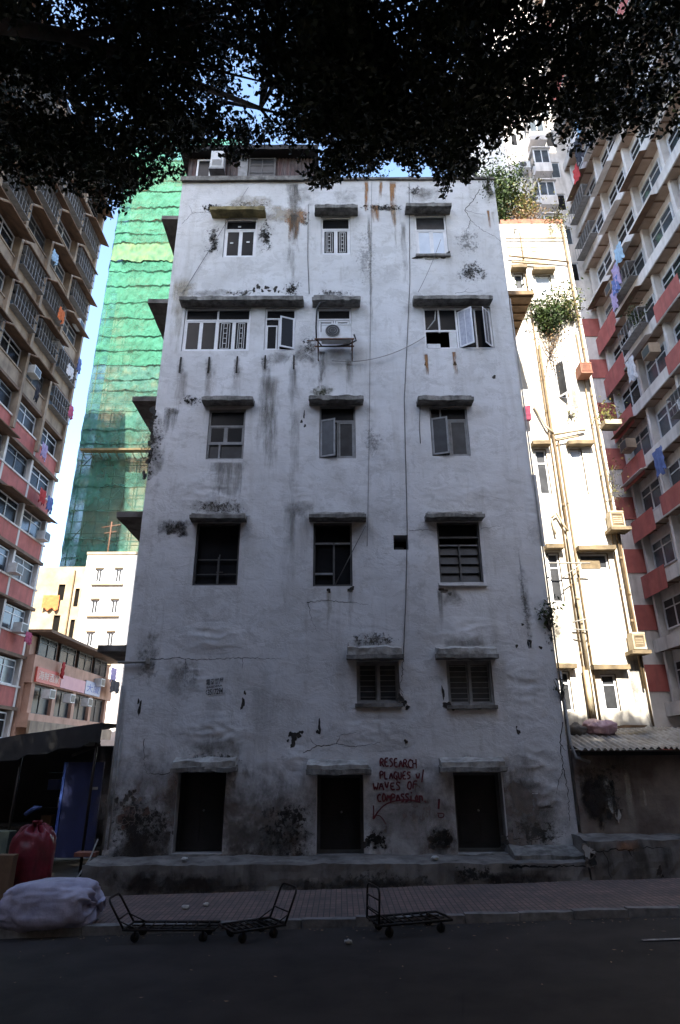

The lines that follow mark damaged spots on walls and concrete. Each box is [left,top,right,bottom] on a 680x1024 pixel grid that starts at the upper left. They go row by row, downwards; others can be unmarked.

rust [273,207,306,237]
rust [365,182,396,223]
damp [141,410,170,480]
crack [154,657,275,683]
damp [581,758,630,822]
damp [112,801,174,857]
damp [234,805,312,856]